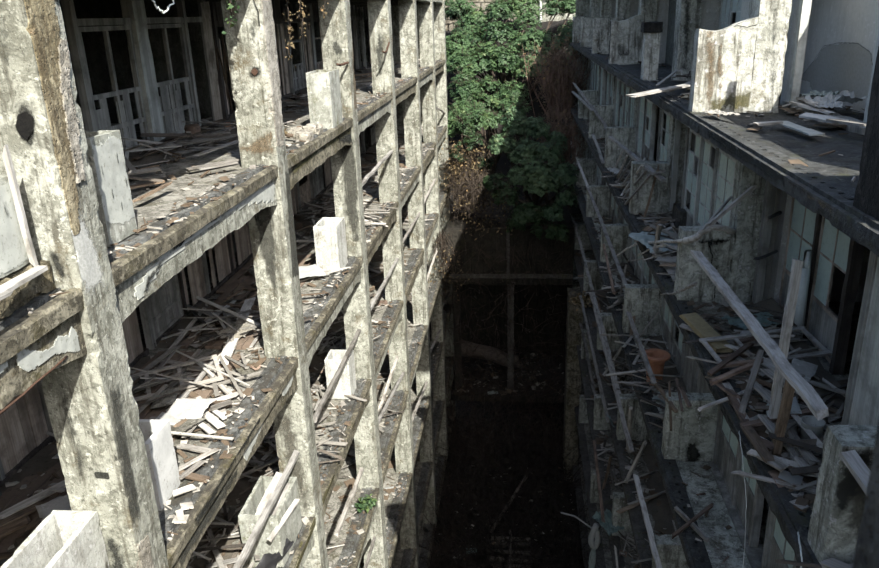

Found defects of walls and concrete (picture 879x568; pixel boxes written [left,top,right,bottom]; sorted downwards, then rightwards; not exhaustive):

flaking render [802,42,873,99]
spalling [15,105,34,145]
spalling [24,0,135,236]
peeling [0,326,80,415]
damp [858,451,874,471]
damp [835,468,866,535]